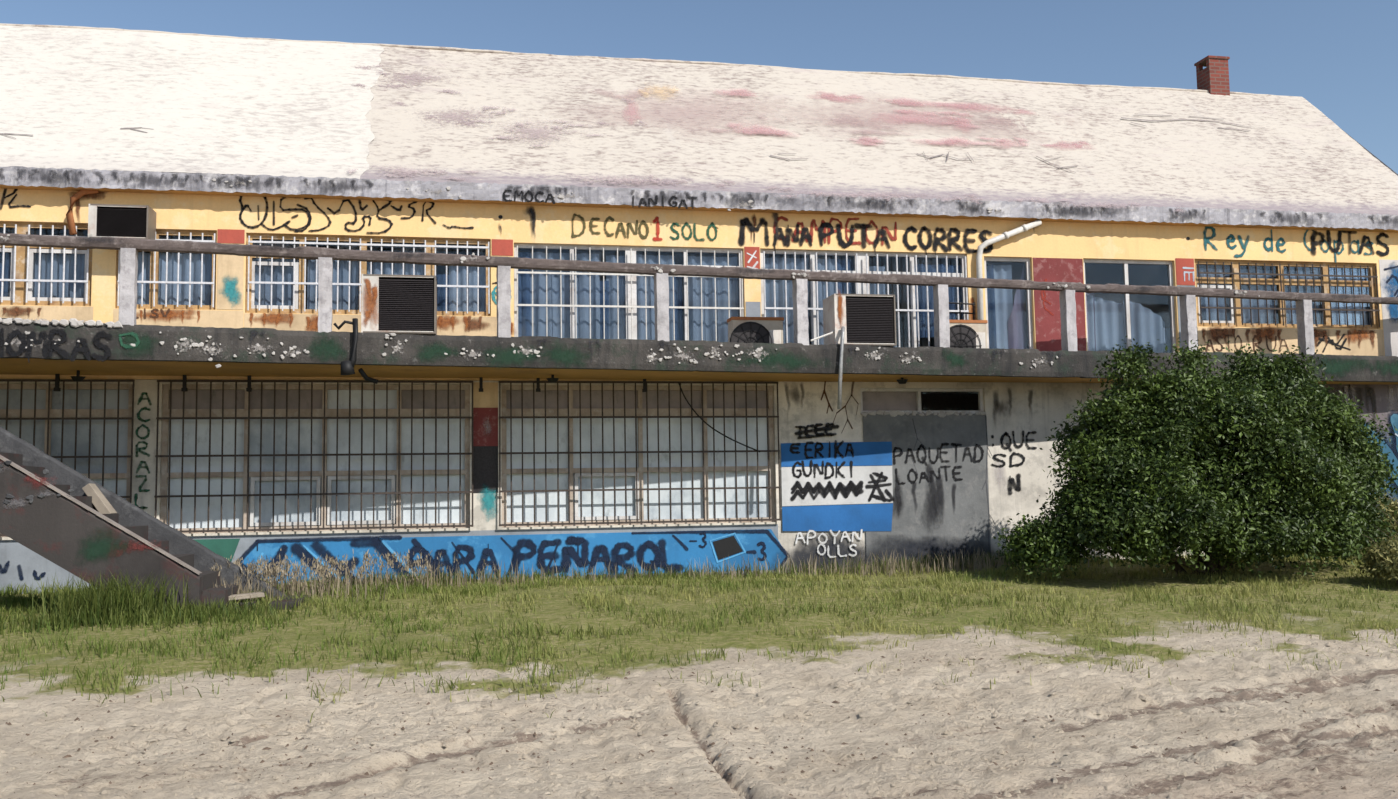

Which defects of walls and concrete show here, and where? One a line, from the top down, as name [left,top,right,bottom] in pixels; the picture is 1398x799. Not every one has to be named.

rust [364,278,377,323]
rust [3,307,41,317]
rust [136,309,200,321]
rust [250,313,318,331]
water stain [895,465,956,509]